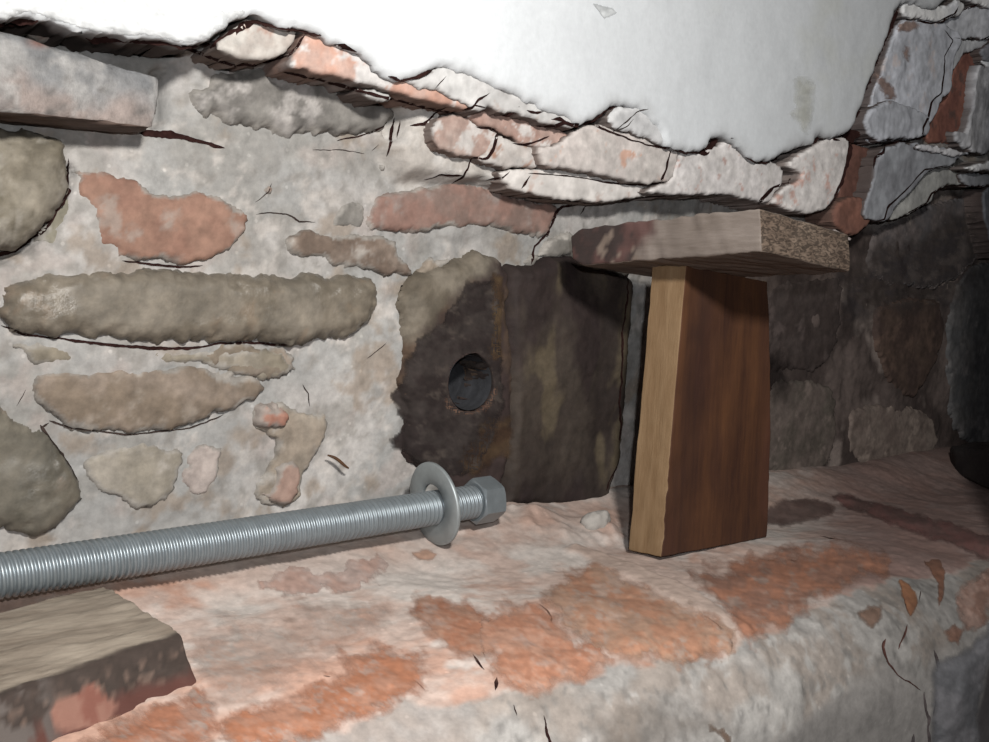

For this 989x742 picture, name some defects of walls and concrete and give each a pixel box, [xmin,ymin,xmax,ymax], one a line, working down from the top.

crack [0,19,38,27]
flaking render [336,89,391,108]
crack [86,0,989,264]
flaking render [848,0,989,260]
spalling [768,494,989,559]
spalling [411,544,889,691]
spalling [899,580,918,616]
spalling [924,559,945,606]
spalling [946,625,963,642]
crack [882,591,935,742]
crack [543,717,551,742]